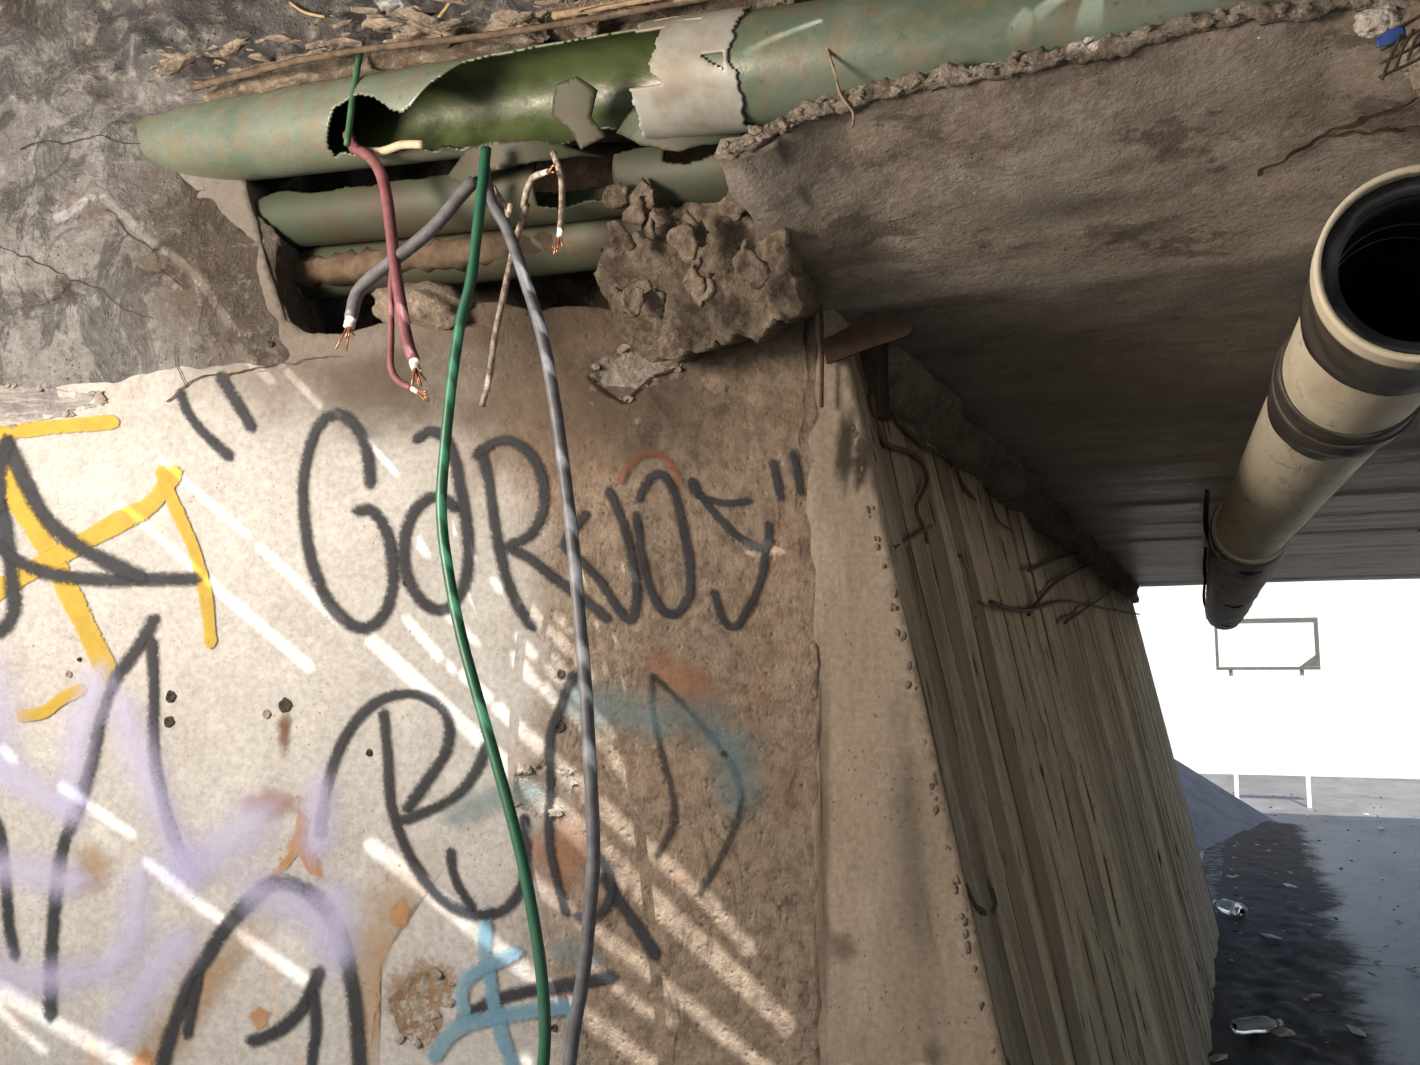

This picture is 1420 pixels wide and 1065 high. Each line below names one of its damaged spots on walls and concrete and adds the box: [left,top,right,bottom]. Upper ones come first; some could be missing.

spalling [730,0,1420,159]
crack [1257,97,1420,177]
spalling [590,177,824,407]